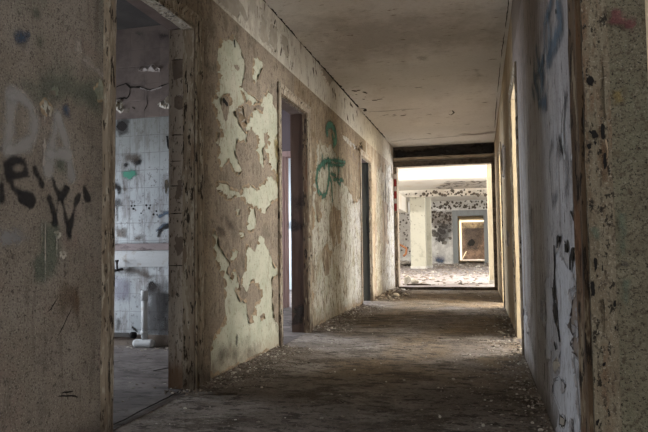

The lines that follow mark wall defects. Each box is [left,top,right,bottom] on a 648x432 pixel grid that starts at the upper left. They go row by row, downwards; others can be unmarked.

crack [116,83,168,111]
peeling [210,34,280,378]
damp [406,181,487,245]
peeling [540,251,580,432]